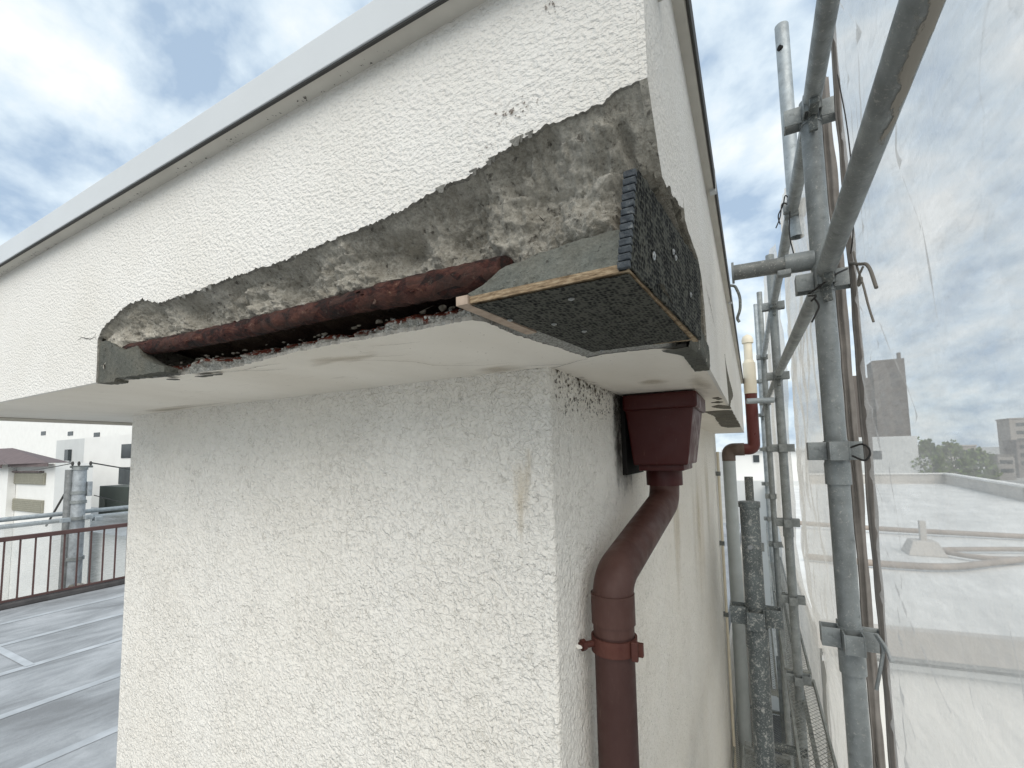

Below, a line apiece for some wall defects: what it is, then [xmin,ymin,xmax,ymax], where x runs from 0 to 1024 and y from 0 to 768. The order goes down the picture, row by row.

spalling [102,84,695,348]
corrosion [169,309,463,378]
spalling [120,288,705,380]
mould [555,370,614,420]